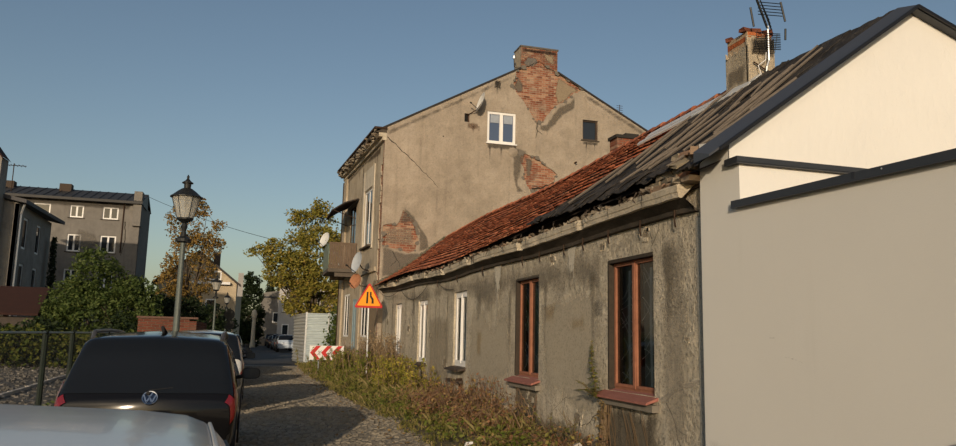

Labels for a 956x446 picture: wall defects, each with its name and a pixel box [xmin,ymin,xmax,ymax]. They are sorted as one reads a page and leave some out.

flaking render [510,62,583,131]
flaking render [514,150,558,193]
spalling [647,146,700,192]
flaking render [372,165,428,295]
peeling [368,308,389,350]